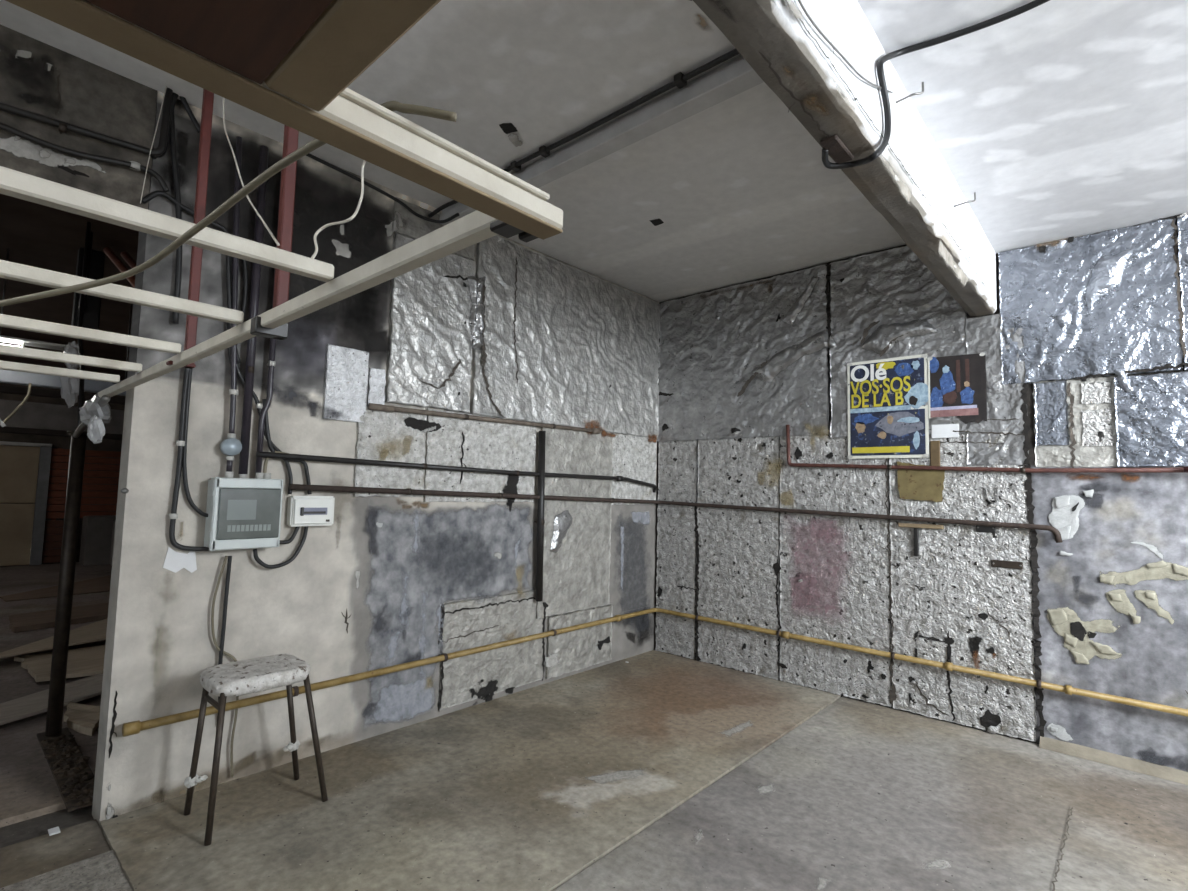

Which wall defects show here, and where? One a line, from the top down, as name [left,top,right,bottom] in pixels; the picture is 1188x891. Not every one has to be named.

crack [420,257,519,417]
peeling [1049,489,1094,556]
peeling [1046,551,1188,665]
crack [1051,807,1073,891]